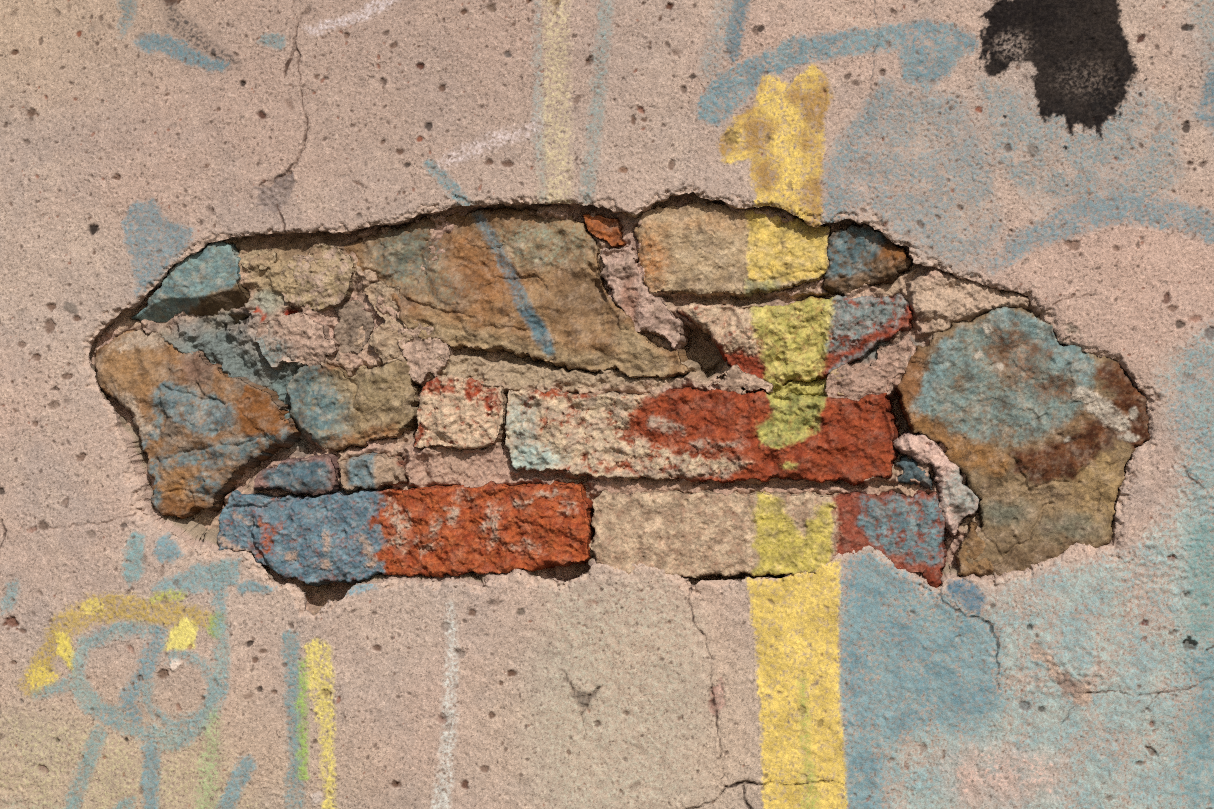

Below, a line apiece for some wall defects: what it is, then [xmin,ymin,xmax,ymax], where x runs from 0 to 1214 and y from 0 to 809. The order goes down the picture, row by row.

crack [257,0,310,234]
spalling [89,192,1150,616]
crack [685,586,846,809]